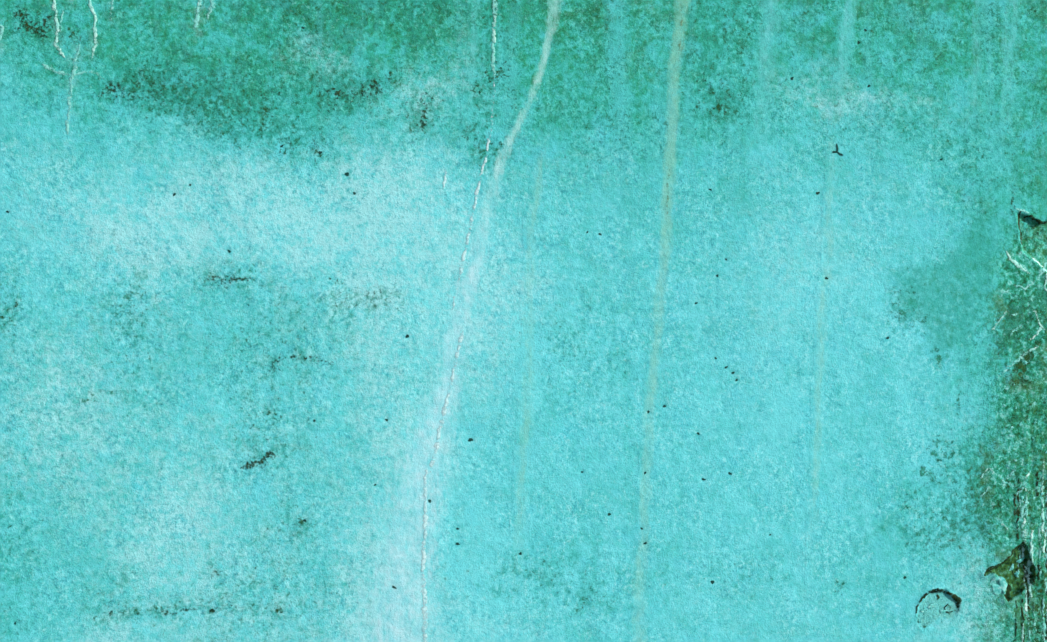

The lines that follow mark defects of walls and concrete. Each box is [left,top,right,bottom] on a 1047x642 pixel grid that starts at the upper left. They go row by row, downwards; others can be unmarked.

crack [42,0,114,134]
crack [194,0,215,27]
water stain [331,0,567,642]
water stain [877,201,1013,377]
water stain [841,505,934,564]
flaking render [972,356,1047,642]
spalling [914,588,962,631]